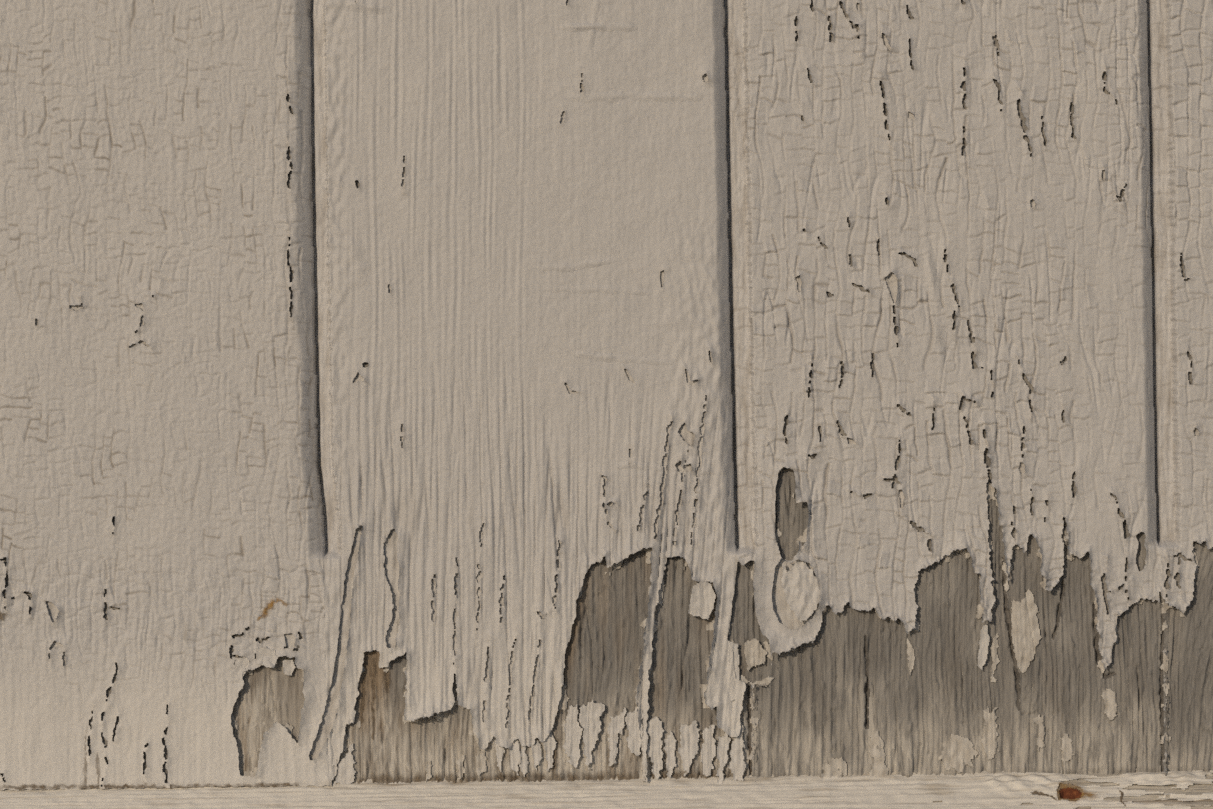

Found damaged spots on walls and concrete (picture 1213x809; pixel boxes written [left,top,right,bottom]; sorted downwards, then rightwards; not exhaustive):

crack [794,0,860,83]
crack [960,35,1076,157]
crack [286,237,294,317]
peeling [675,461,692,473]
peeling [678,423,695,447]
crack [783,217,1077,711]
crack [0,557,32,614]
crack [229,626,303,659]
peeling [309,467,1213,786]
crack [88,662,119,787]
crack [143,704,168,783]
peeling [231,633,305,777]